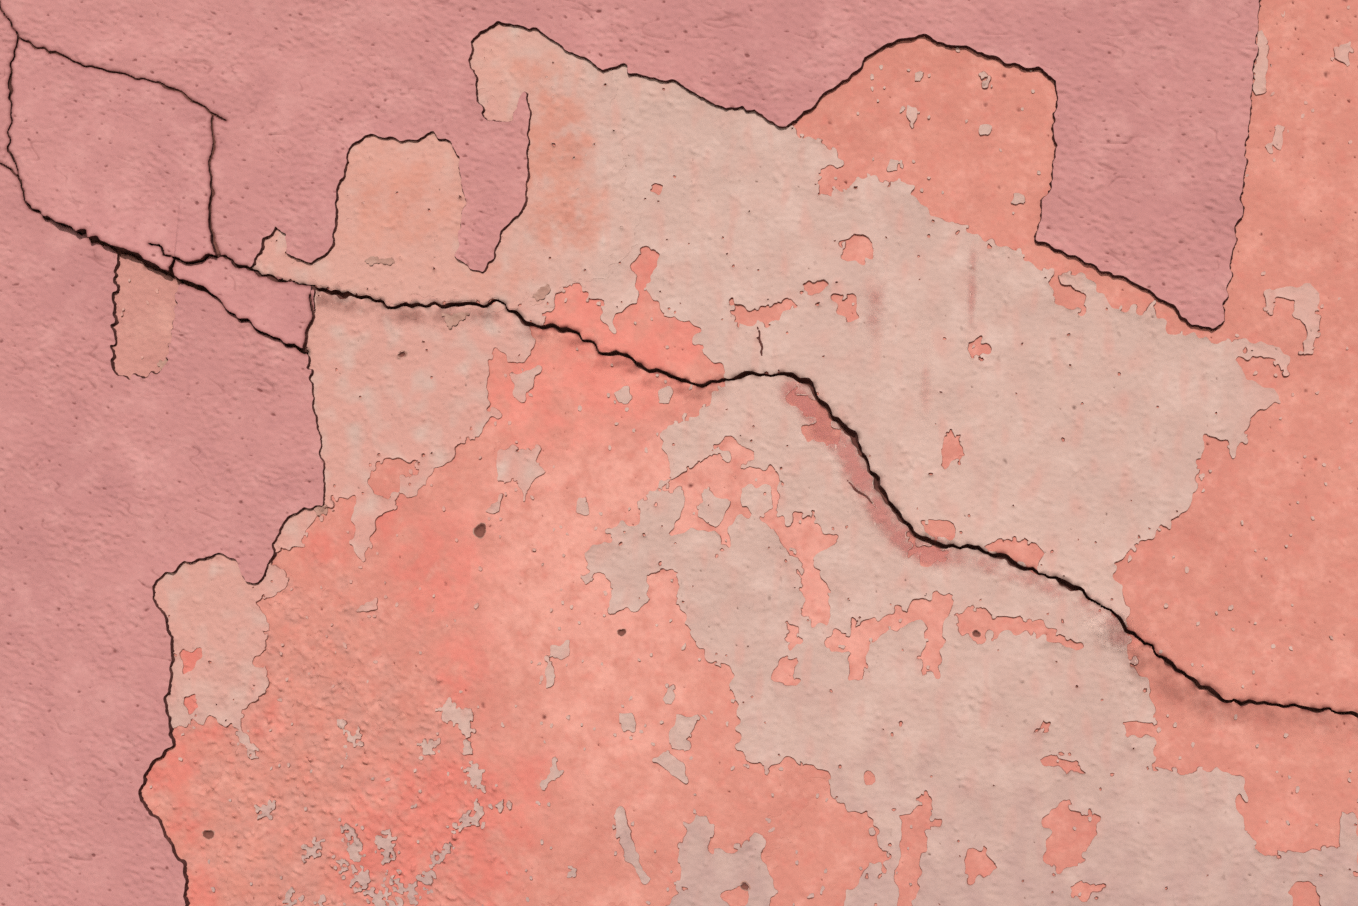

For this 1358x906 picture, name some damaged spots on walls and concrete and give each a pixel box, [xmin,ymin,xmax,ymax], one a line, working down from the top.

peeling [470,23,547,65]
flaking render [112,254,182,379]
peeling [504,365,542,403]
peeling [616,352,712,404]
crack [0,2,1358,718]
peeling [473,441,555,539]
peeling [693,487,731,527]
peeling [530,627,584,688]
peeling [613,683,713,784]
peeling [332,690,513,906]
peeling [535,756,564,807]
peeling [612,806,673,884]